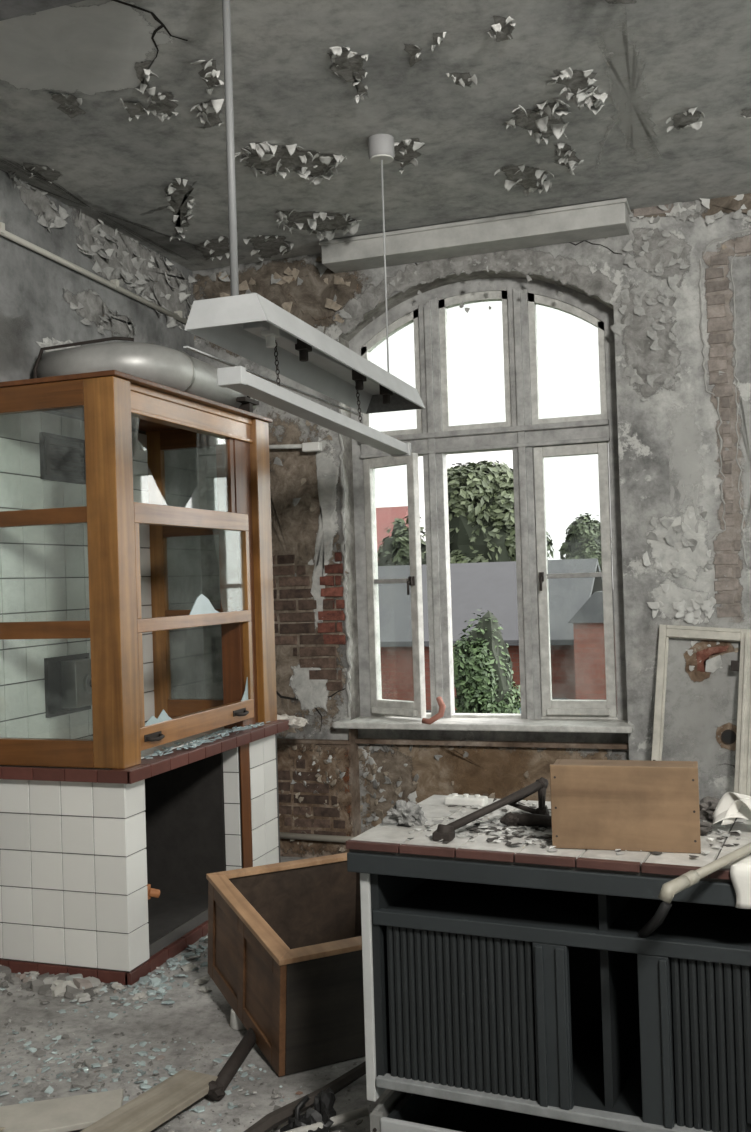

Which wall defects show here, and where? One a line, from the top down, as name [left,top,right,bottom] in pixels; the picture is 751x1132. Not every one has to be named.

flaking render [0,0,224,129]
crack [112,0,188,83]
peeling [235,142,346,186]
peeling [327,46,368,104]
peeling [494,67,608,196]
flaking render [8,162,751,401]
peeling [642,505,716,625]
flaking render [268,407,624,857]
flaking render [683,640,740,682]
peeling [689,820,751,858]